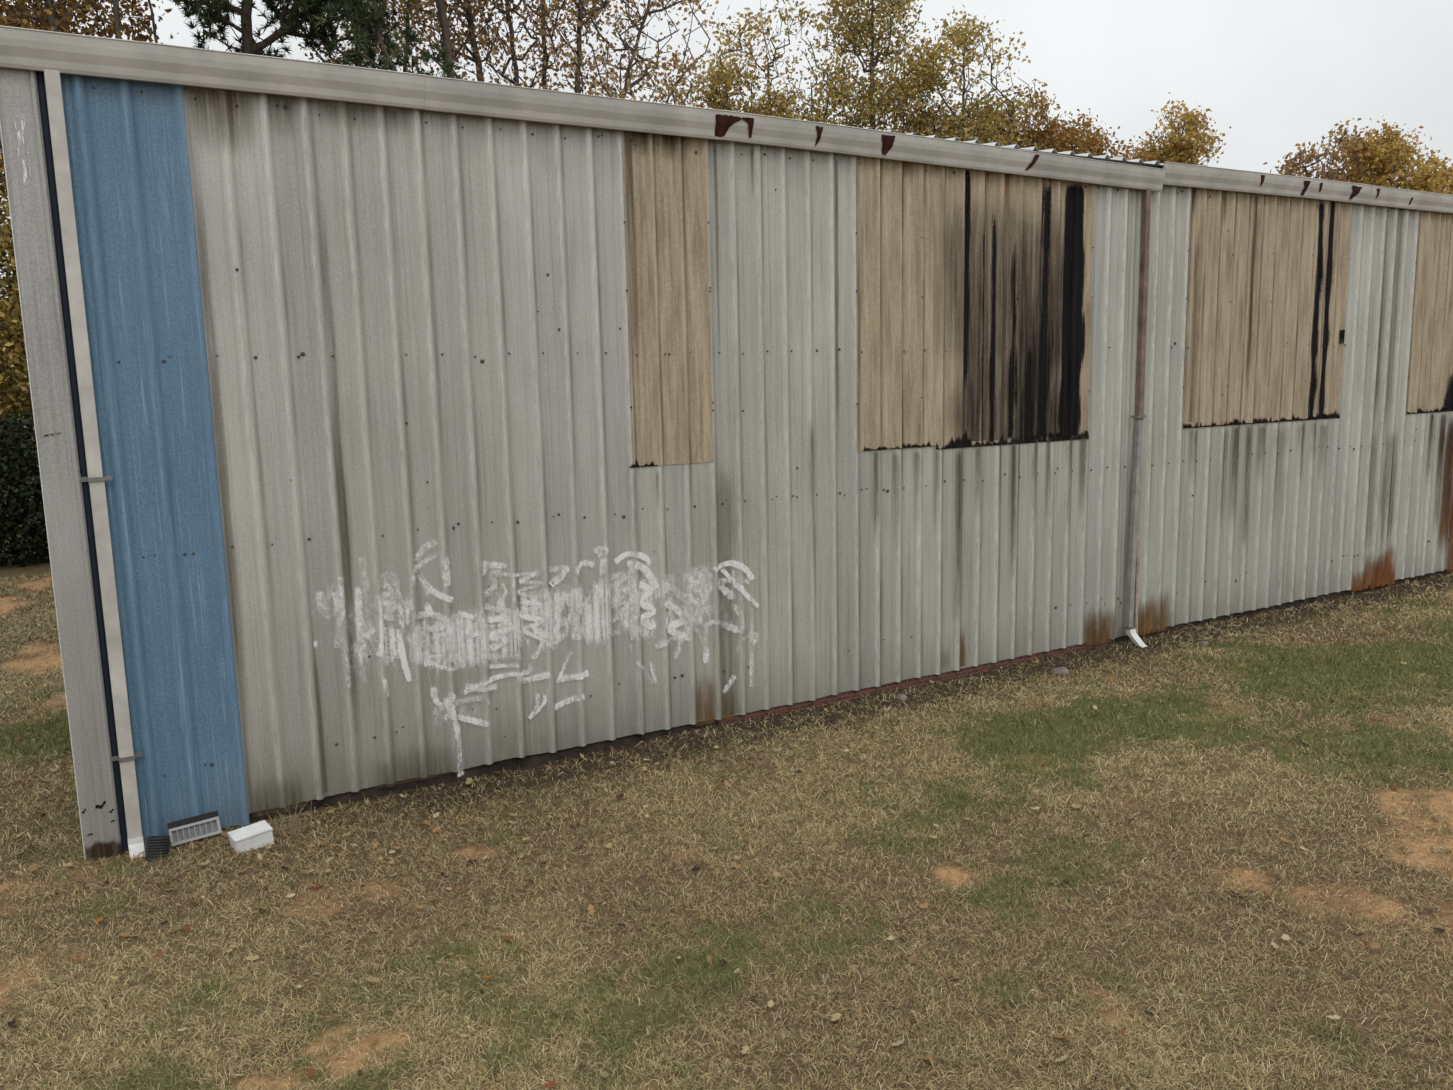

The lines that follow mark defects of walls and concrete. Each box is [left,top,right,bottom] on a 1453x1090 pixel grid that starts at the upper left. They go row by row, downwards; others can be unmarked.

corrosion [715,114,754,138]
corrosion [882,135,895,155]
damp [864,170,1089,451]
damp [1183,201,1345,428]
damp [1406,376,1453,414]
corrosion [1429,414,1453,572]
corrosion [1351,554,1395,592]